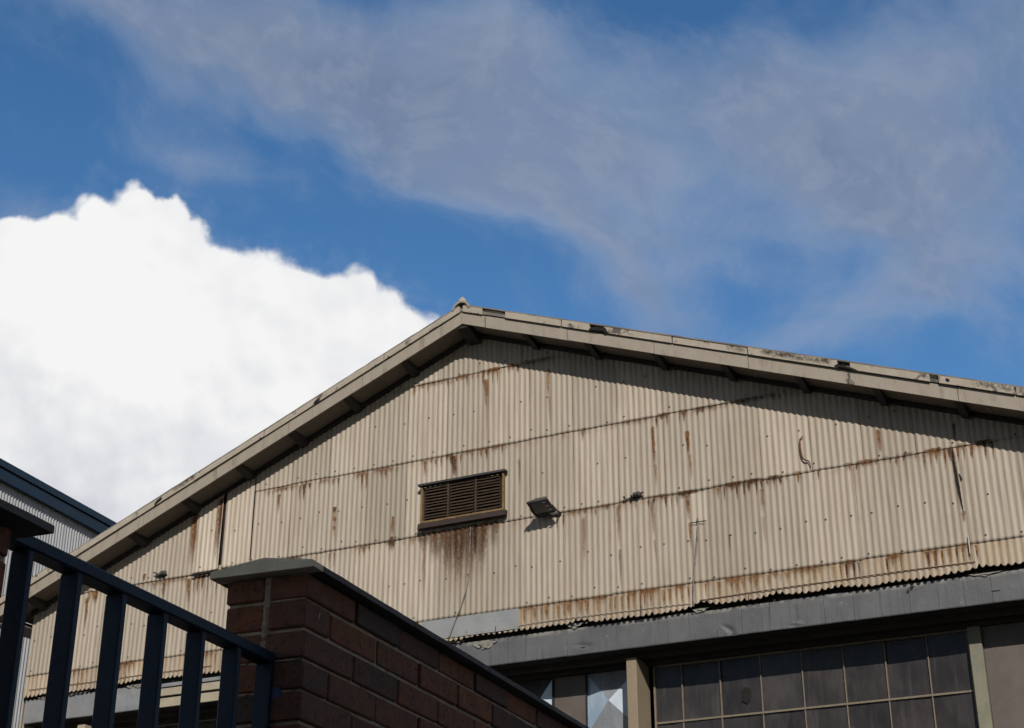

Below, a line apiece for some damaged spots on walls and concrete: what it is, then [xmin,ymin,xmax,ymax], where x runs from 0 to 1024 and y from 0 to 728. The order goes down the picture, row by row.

rust [652,404,713,477]
rust [890,424,994,464]
rust [717,475,781,500]
rust [648,490,694,539]
rust [925,545,978,566]
rust [705,566,818,591]
rust [523,584,689,620]